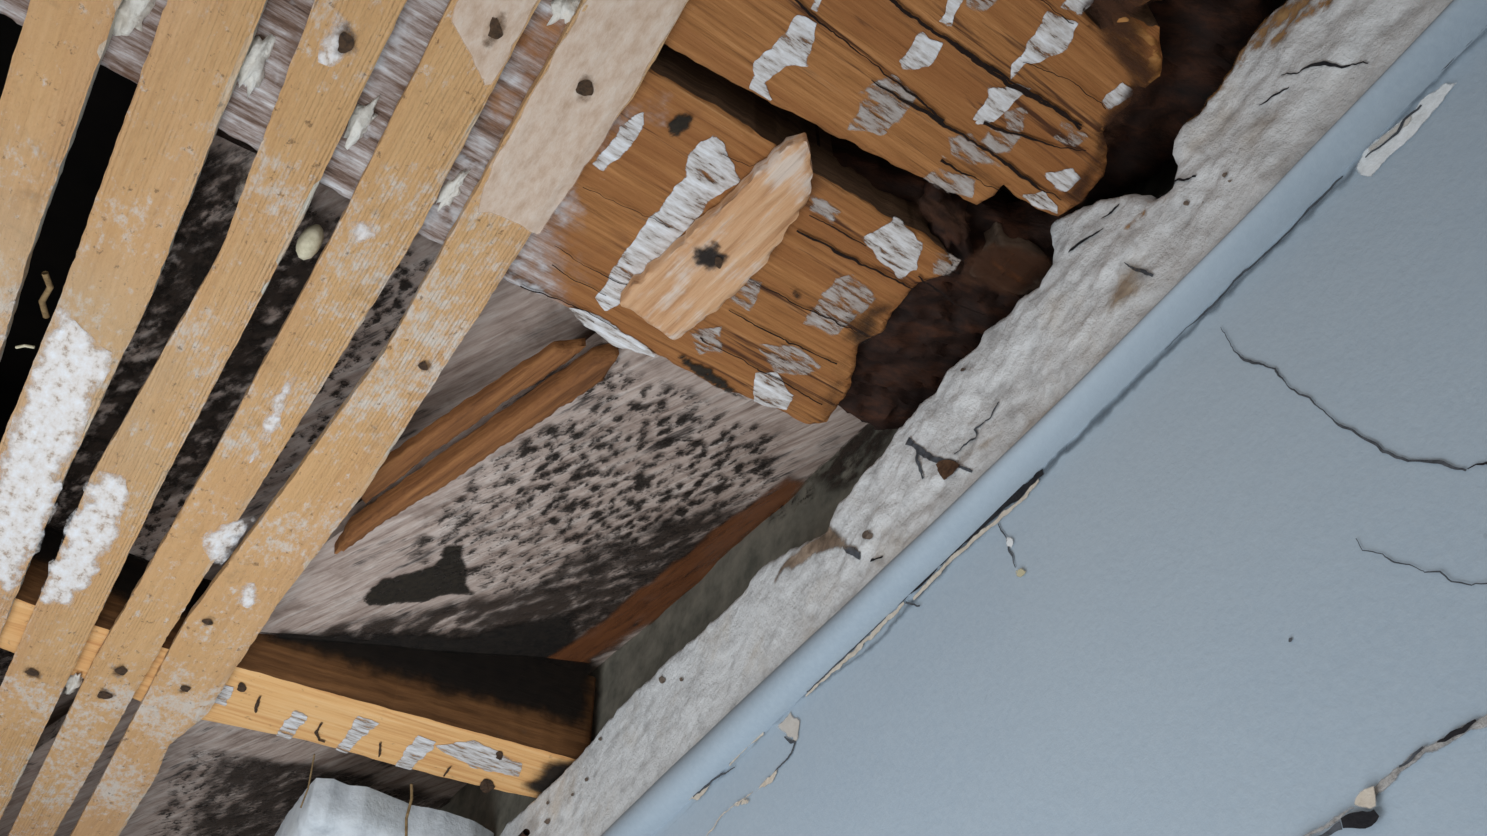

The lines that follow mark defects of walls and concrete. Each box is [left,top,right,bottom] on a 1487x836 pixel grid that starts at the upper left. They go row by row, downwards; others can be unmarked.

leakage [181,578,212,615]
leakage [261,356,893,725]
crack [806,469,1043,697]
crack [905,402,999,480]
flaking render [500,0,1456,836]
crack [1165,176,1487,471]
crack [1356,539,1487,586]
crack [1304,715,1487,836]